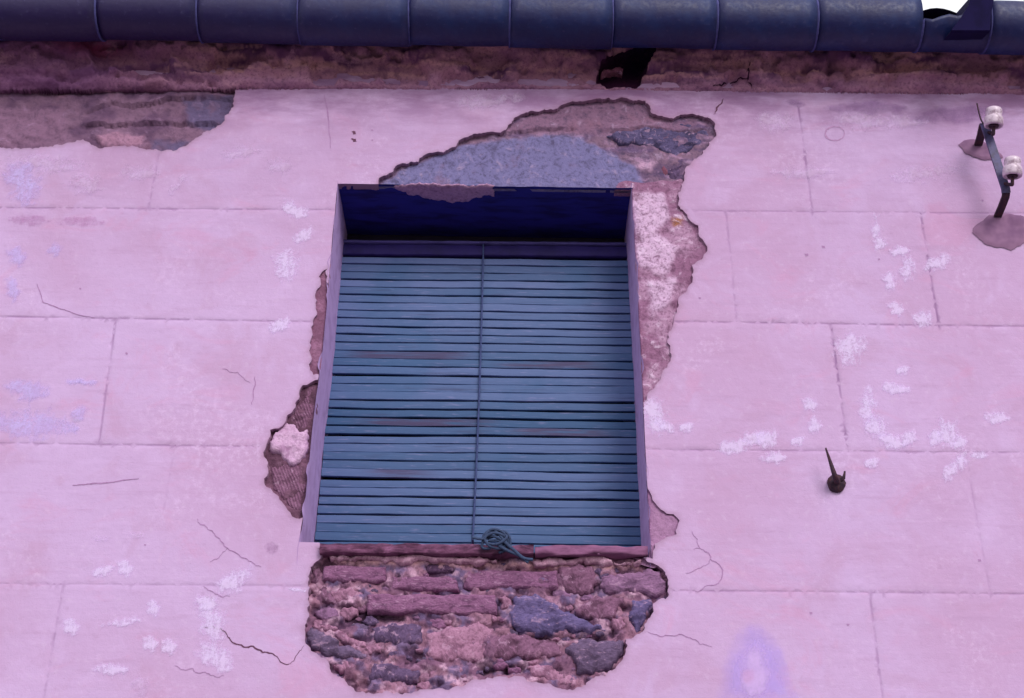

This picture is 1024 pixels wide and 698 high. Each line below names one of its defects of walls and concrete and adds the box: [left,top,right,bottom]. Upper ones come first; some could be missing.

spalling [600,67,623,80]
spalling [0,91,235,151]
peeling [275,203,311,277]
spalling [371,101,716,432]
spalling [264,264,331,519]
crack [198,522,261,567]
spalling [292,489,679,694]
crack [687,533,723,592]
crack [206,626,303,665]